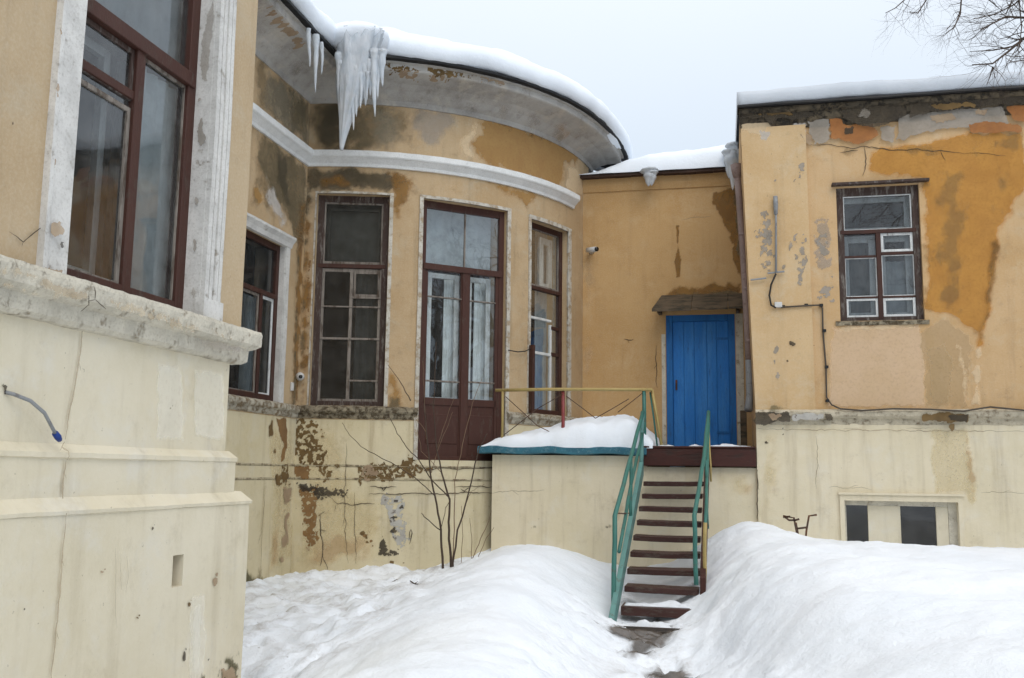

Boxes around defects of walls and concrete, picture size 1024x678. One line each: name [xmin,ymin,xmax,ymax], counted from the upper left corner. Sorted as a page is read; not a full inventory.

damp [254,135,412,242]
damp [497,185,535,206]
damp [461,120,583,195]
damp [669,189,741,296]
crack [808,144,1005,174]
flaking render [794,104,1024,145]
damp [870,132,1024,404]
spalling [754,406,833,435]
spalling [922,412,969,431]
crack [51,335,82,678]
peeling [269,418,348,562]
peeling [357,455,432,564]